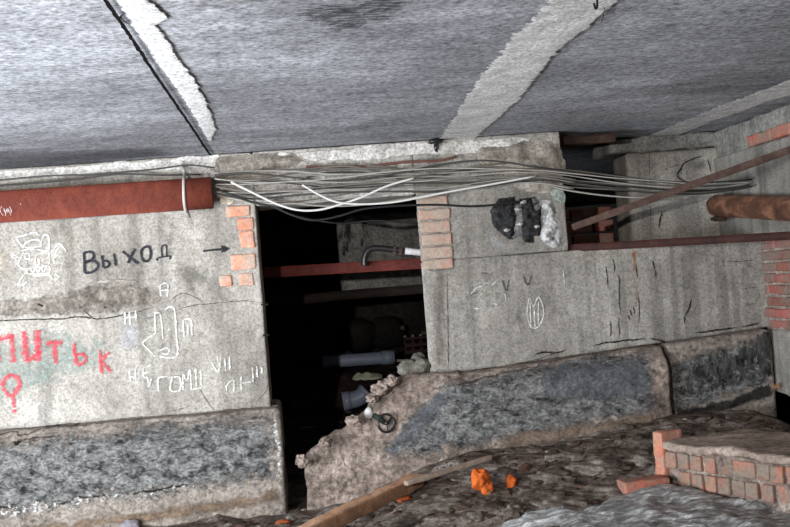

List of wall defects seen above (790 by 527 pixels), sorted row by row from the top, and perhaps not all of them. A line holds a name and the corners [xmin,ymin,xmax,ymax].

crack [103,0,215,155]
flaking render [117,0,217,143]
crack [0,293,260,321]